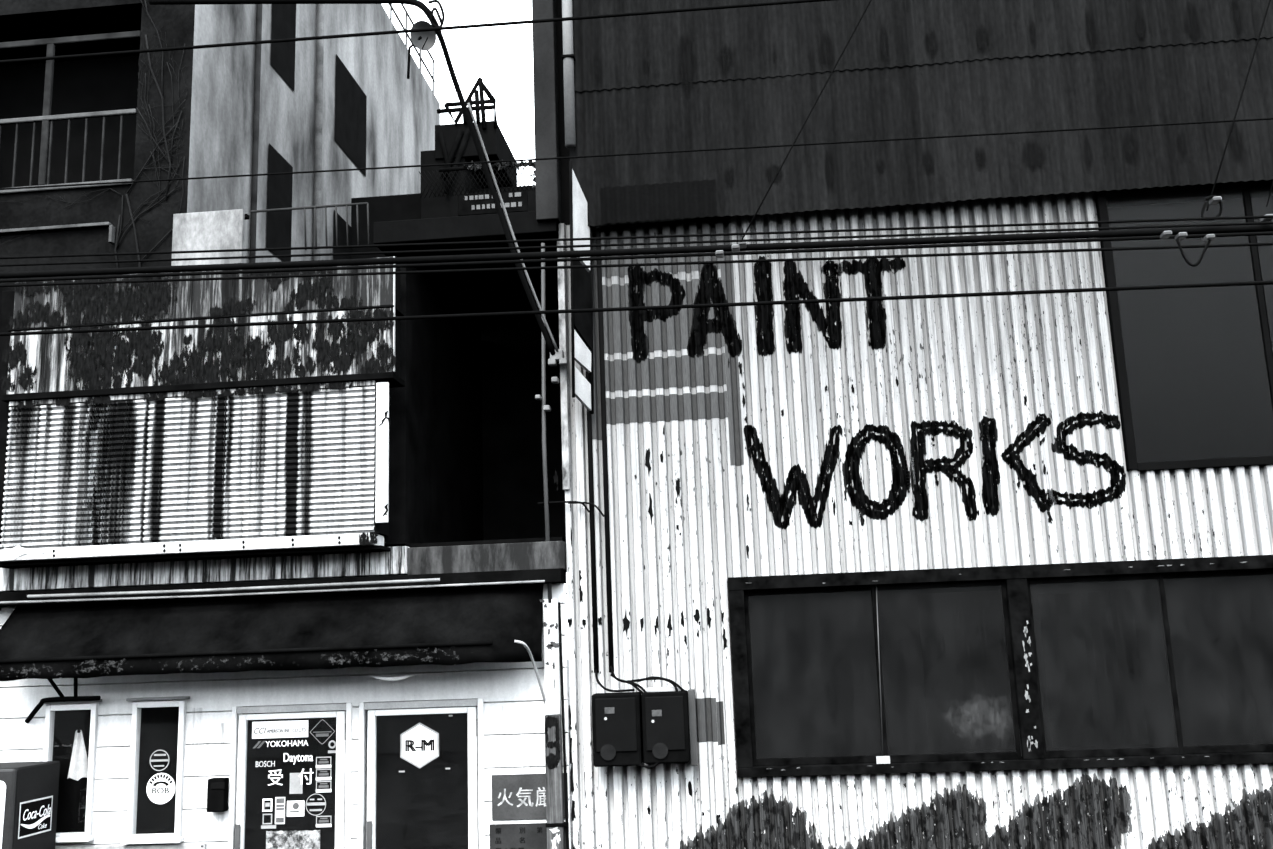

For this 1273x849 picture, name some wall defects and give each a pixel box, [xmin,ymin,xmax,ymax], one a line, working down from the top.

damp [2,272,207,547]
damp [179,265,376,540]
peeling [540,599,602,849]
peeling [622,608,727,659]